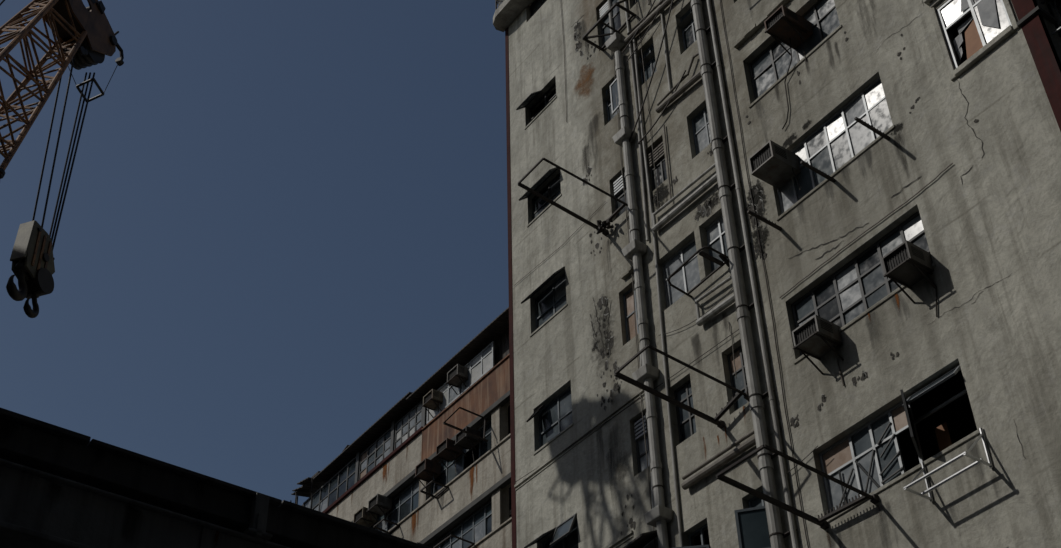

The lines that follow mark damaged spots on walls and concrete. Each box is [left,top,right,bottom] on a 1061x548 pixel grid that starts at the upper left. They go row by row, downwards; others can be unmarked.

crack [957,80,984,184]
crack [788,223,868,260]
spalling [592,296,622,411]